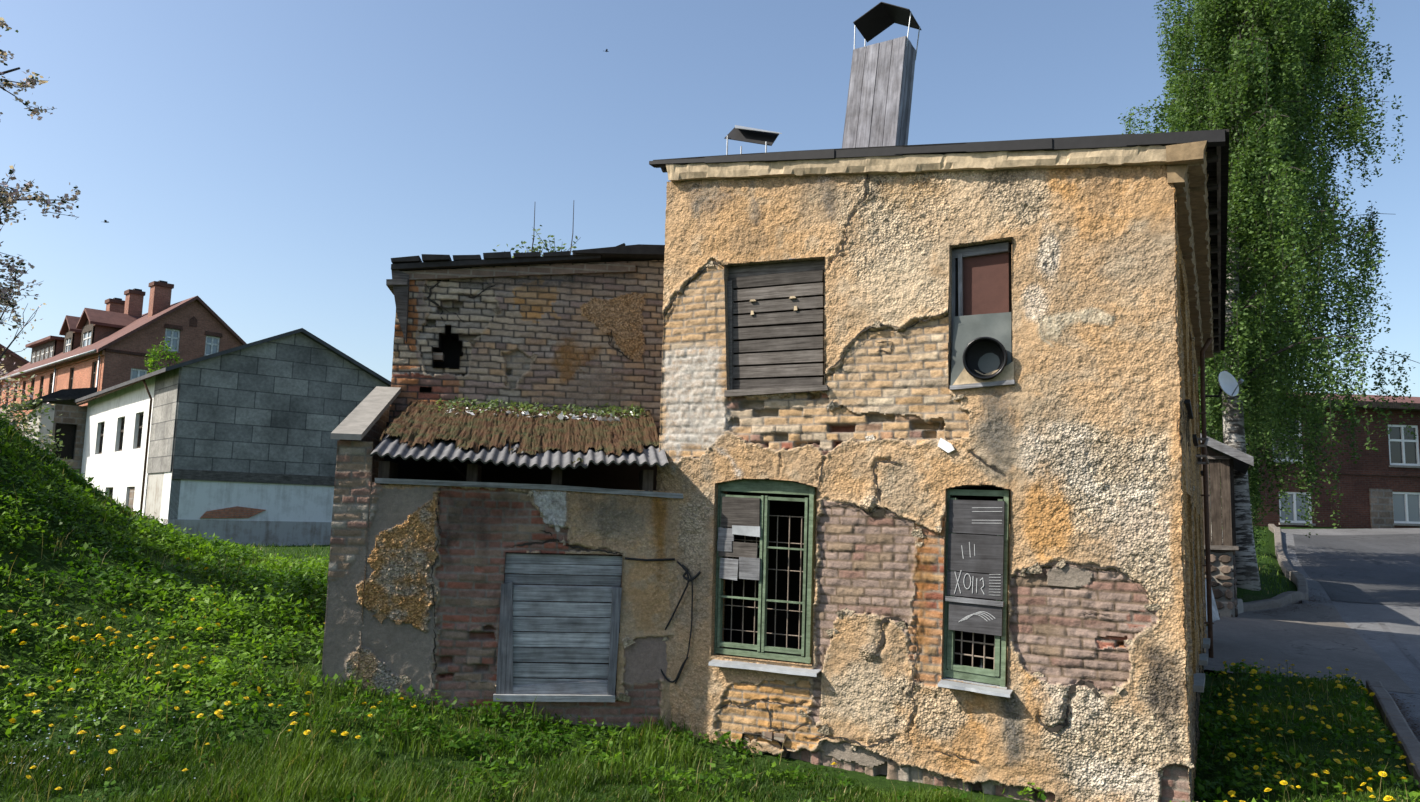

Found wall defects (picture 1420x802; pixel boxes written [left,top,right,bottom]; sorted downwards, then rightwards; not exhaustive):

crack [824,174,881,272]
crack [662,261,719,327]
spalling [659,259,734,462]
crack [823,310,950,375]
spalling [823,315,969,453]
crack [818,450,933,523]
spalling [432,486,671,730]
crack [717,617,981,765]
spalling [716,500,1055,802]
crack [1036,680,1099,732]
crack [1013,561,1153,604]
spalling [1009,559,1160,693]